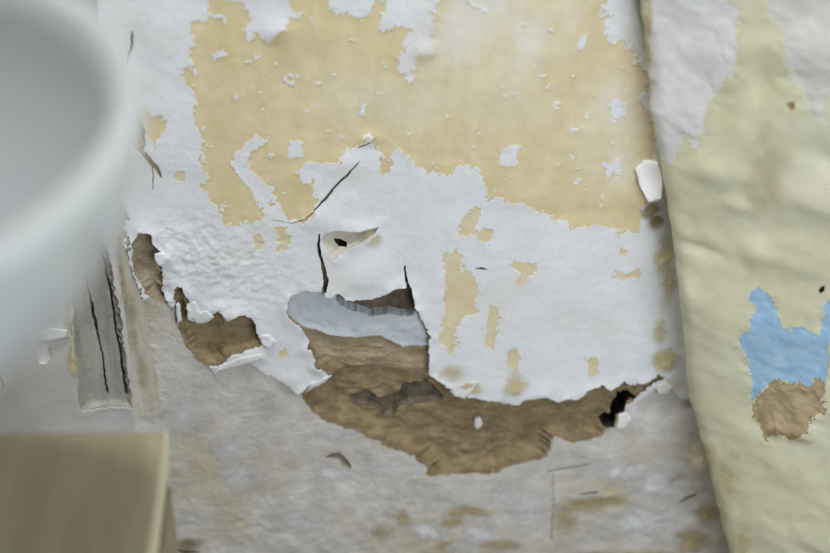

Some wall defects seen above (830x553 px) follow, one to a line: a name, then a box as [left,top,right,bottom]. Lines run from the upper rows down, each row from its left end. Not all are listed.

spalling [142,109,167,189]
crack [297,138,377,292]
peeling [179,0,742,253]
peeling [765,0,830,120]
flaking render [38,213,729,553]
peeling [738,287,830,443]